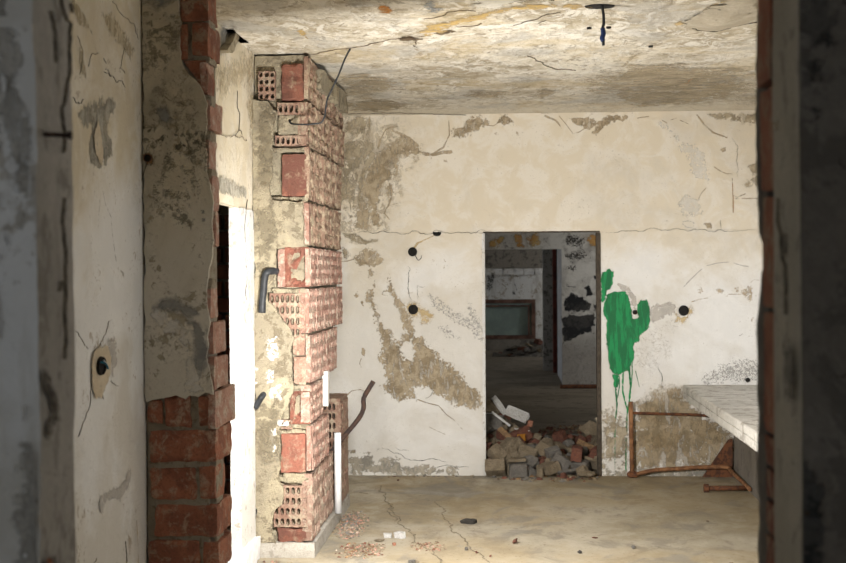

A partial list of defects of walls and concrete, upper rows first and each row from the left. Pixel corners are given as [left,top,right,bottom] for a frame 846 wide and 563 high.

crack [48,0,138,153]
crack [307,10,482,56]
crack [527,56,576,71]
peeling [676,0,758,32]
flaking render [78,96,116,168]
crack [222,91,247,141]
peeling [542,112,649,134]
peeling [353,115,514,230]
flaking render [342,248,483,421]
damp [595,386,757,476]
crack [359,488,442,563]
crack [435,501,490,563]